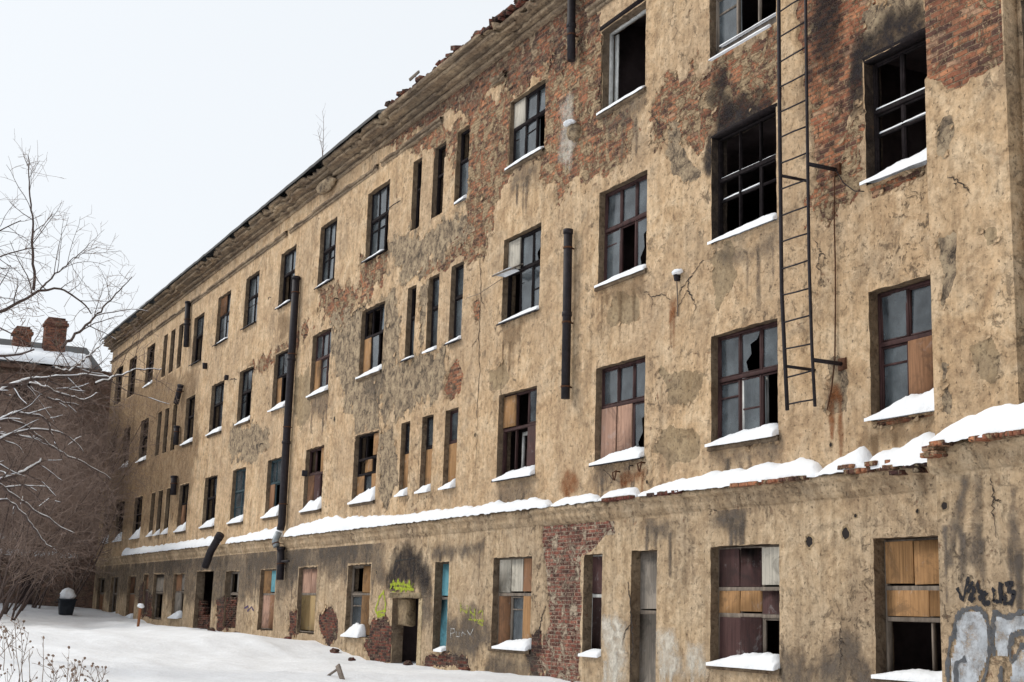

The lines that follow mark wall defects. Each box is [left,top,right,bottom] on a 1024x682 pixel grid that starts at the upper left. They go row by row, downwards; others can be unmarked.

flaking render [796,0,1003,230]
flaking render [248,0,782,513]
crack [646,260,704,311]
corrosion [829,386,842,452]
flaking render [319,604,338,646]
flaking render [363,614,392,663]
flaking render [523,521,615,682]
leakage [942,479,984,574]
leakage [1009,520,1022,616]